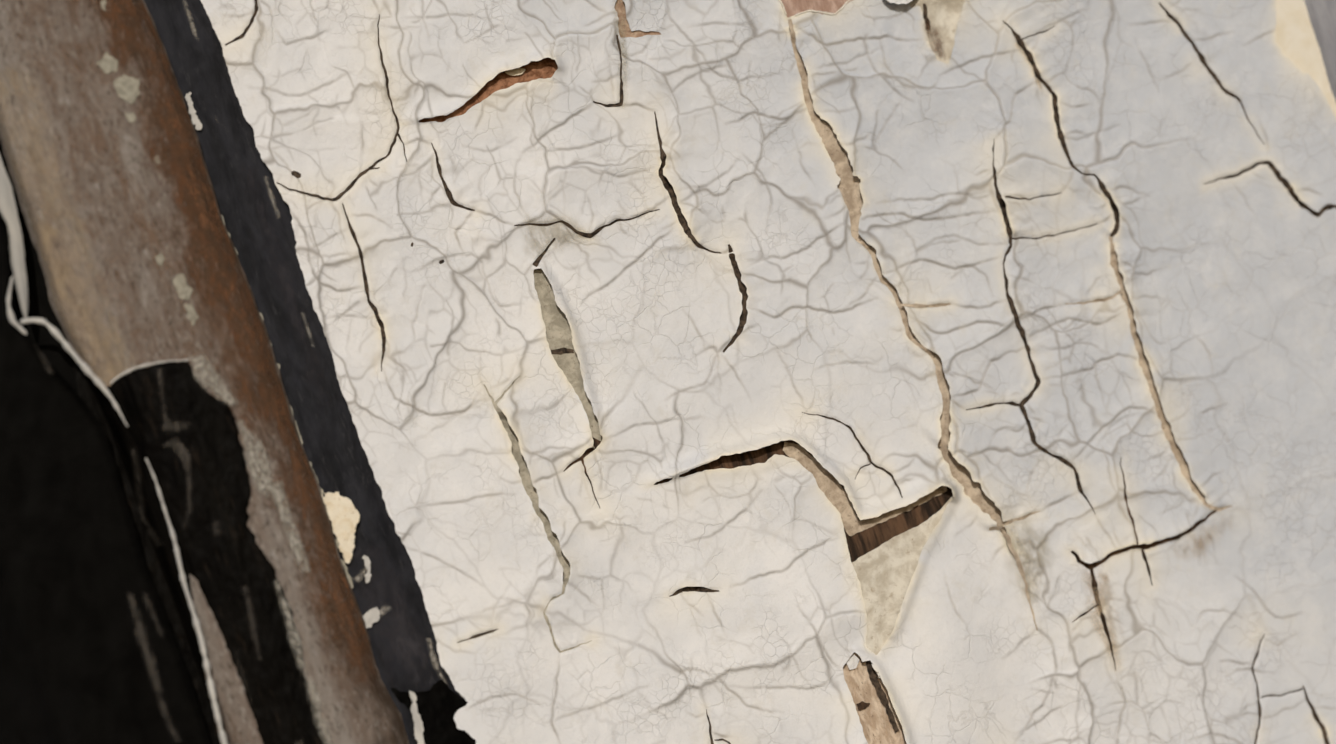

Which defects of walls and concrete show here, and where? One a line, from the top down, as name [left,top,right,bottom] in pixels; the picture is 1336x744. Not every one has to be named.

crack [277,14,475,372]
peeling [419,58,558,123]
crack [514,112,748,352]
peeling [778,0,852,18]
peeling [887,0,966,64]
crack [1159,2,1336,217]
peeling [533,268,602,449]
crack [654,19,1232,671]
peeling [409,691,425,744]
crack [483,376,592,653]
peeling [843,486,1040,744]
crack [1251,634,1329,744]